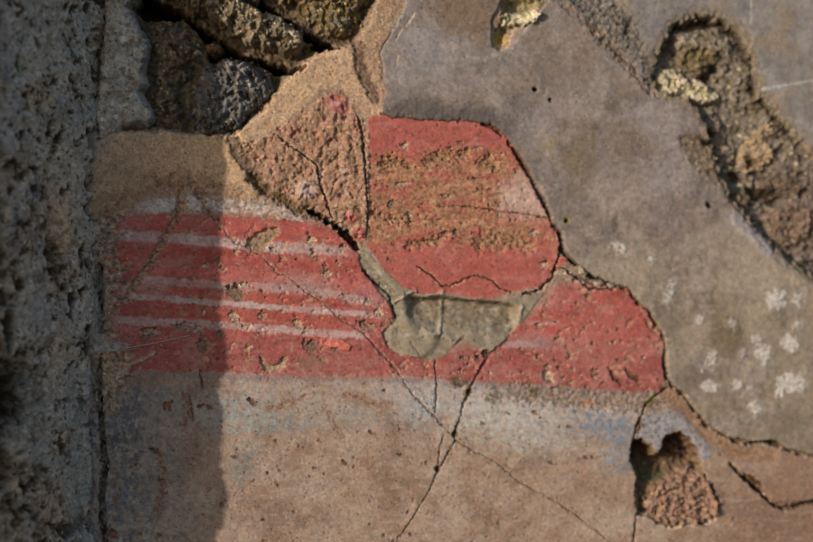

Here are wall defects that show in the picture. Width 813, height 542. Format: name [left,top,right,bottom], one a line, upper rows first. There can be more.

spalling [501,0,548,36]
spalling [353,41,381,104]
spalling [571,0,813,279]
peeling [187,88,556,279]
crack [277,113,397,321]
crack [416,247,594,297]
water stain [708,307,749,355]
water stain [666,357,716,394]
crack [277,273,610,542]
peeling [503,337,781,494]
crack [698,414,813,458]
crack [757,491,813,512]